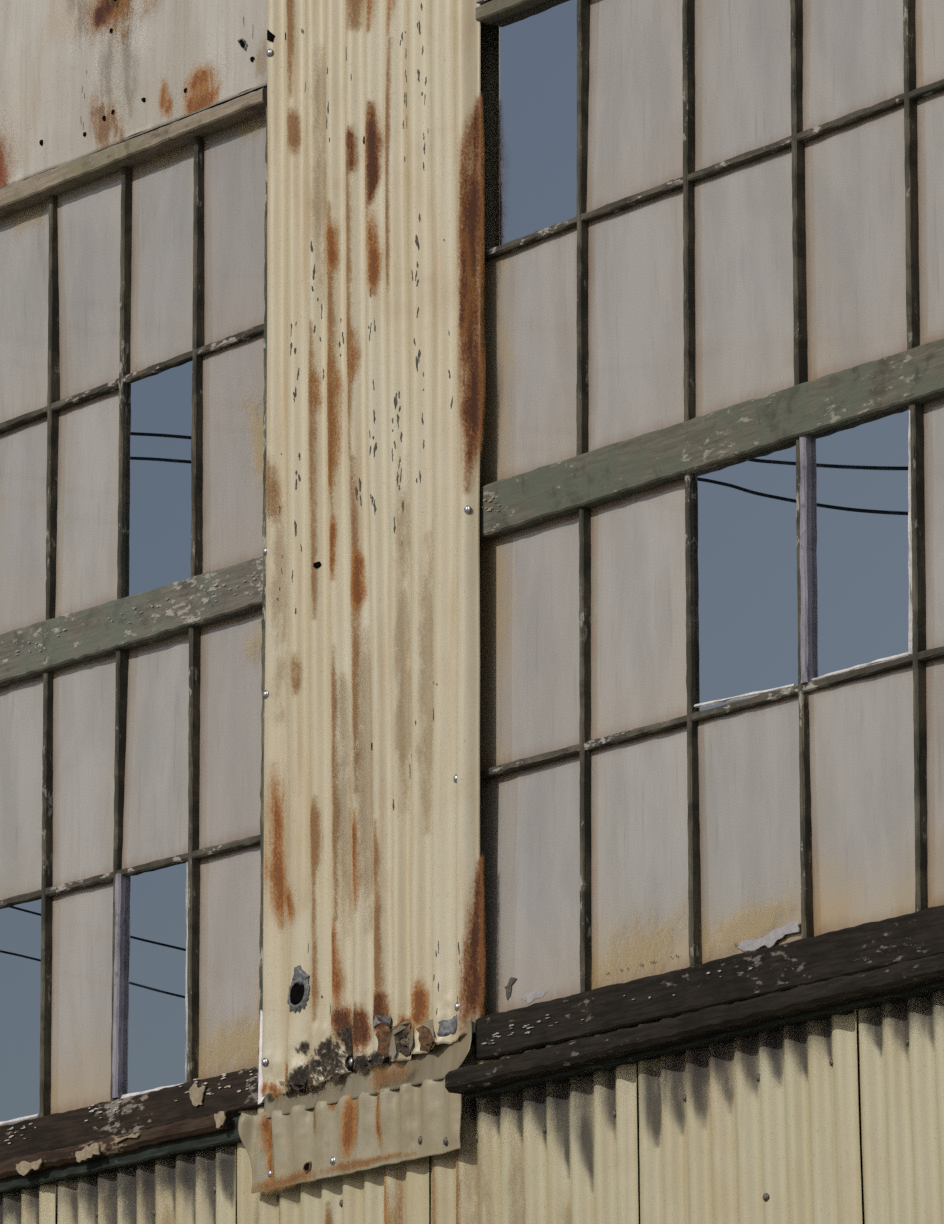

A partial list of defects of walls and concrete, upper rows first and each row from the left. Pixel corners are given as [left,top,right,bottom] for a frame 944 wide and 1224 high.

corrosion [287,110,300,151]
corrosion [458,96,484,491]
corrosion [308,0,394,772]
corrosion [260,659,484,1171]
peeling [737,921,800,952]
damp [868,990,944,1050]
peeling [16,1158,43,1176]
peeling [75,1143,100,1163]
damp [71,1147,235,1224]
peeling [174,1071,255,1107]
damp [471,1070,615,1178]
damp [644,1021,831,1138]